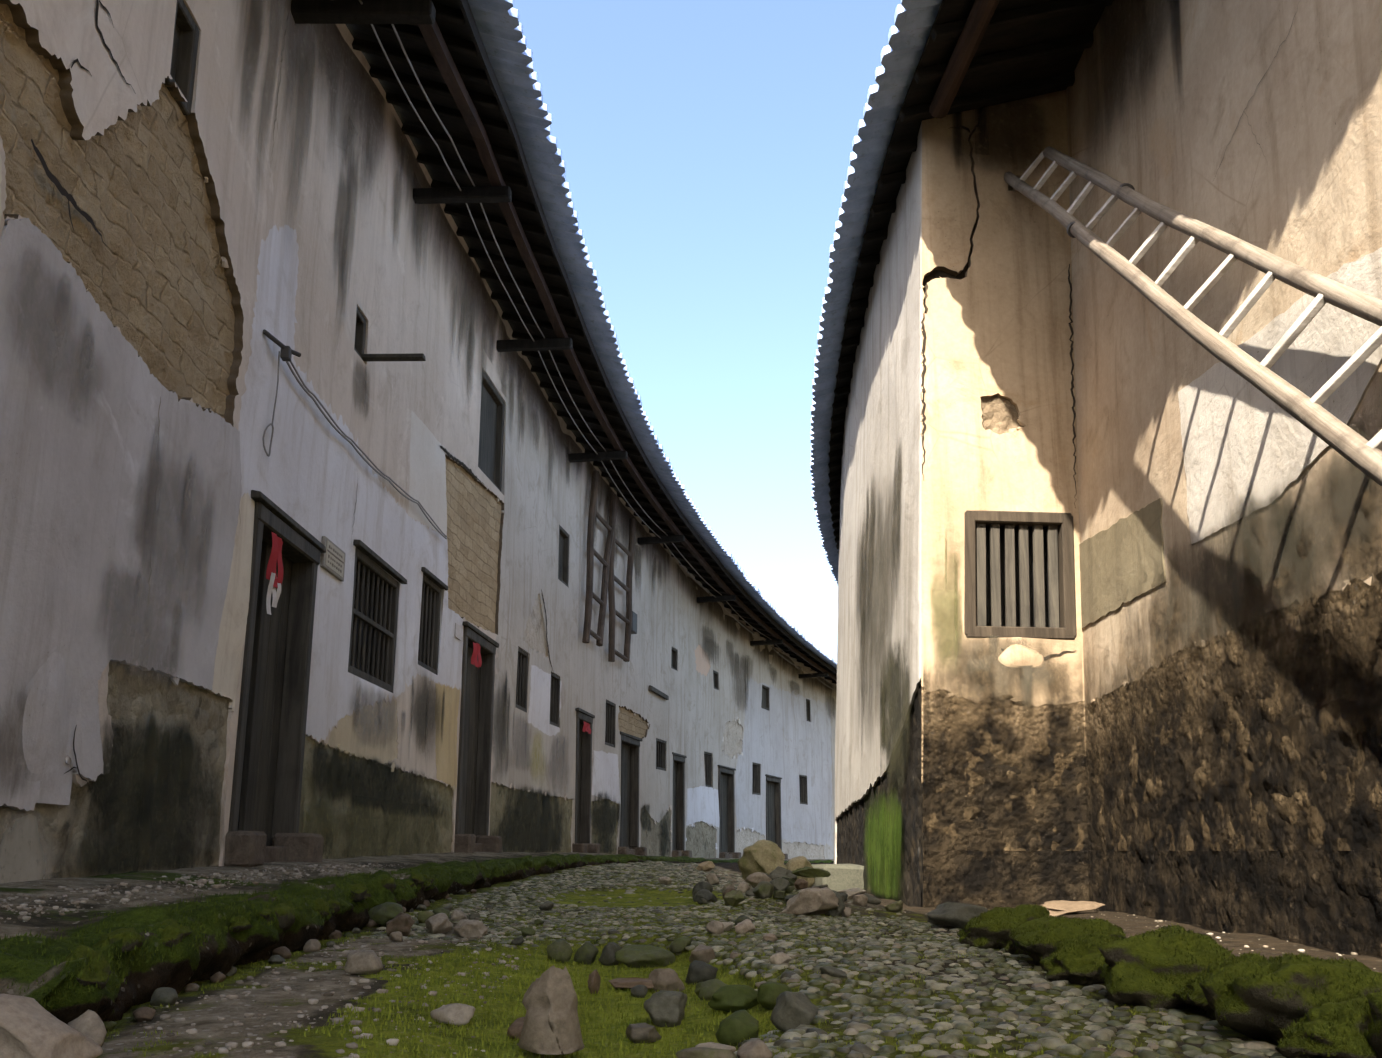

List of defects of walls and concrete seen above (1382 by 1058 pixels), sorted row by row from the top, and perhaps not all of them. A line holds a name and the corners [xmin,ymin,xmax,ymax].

crack [71,0,136,94]
flaking render [0,3,235,418]
crack [921,208,978,481]
flaking render [981,395,1029,436]
crack [1068,264,1077,508]
flaking render [445,457,504,633]
flaking render [0,660,229,879]
damp [314,746,438,815]
damp [493,788,563,853]
damp [593,795,620,853]
damp [640,806,670,856]
damp [857,455,1382,960]